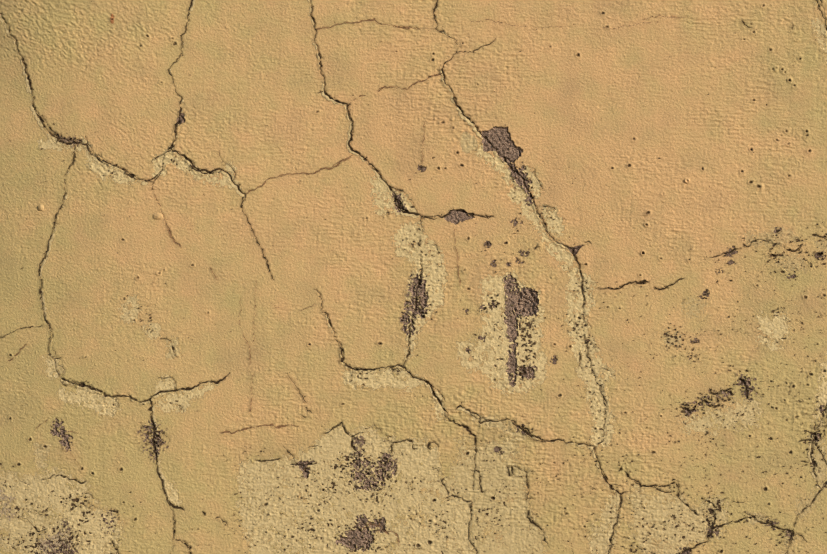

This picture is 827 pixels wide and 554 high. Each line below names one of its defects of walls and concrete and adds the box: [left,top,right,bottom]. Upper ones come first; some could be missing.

crack [814,0,827,38]
crack [0,0,493,554]
peeling [341,176,448,421]
spalling [444,209,475,224]
crack [378,2,684,308]
peeling [456,126,616,448]
crack [706,234,827,258]
peeling [761,222,827,279]
crack [303,258,827,554]
peeling [676,358,777,437]
peeling [0,418,124,554]
peeling [236,414,548,554]